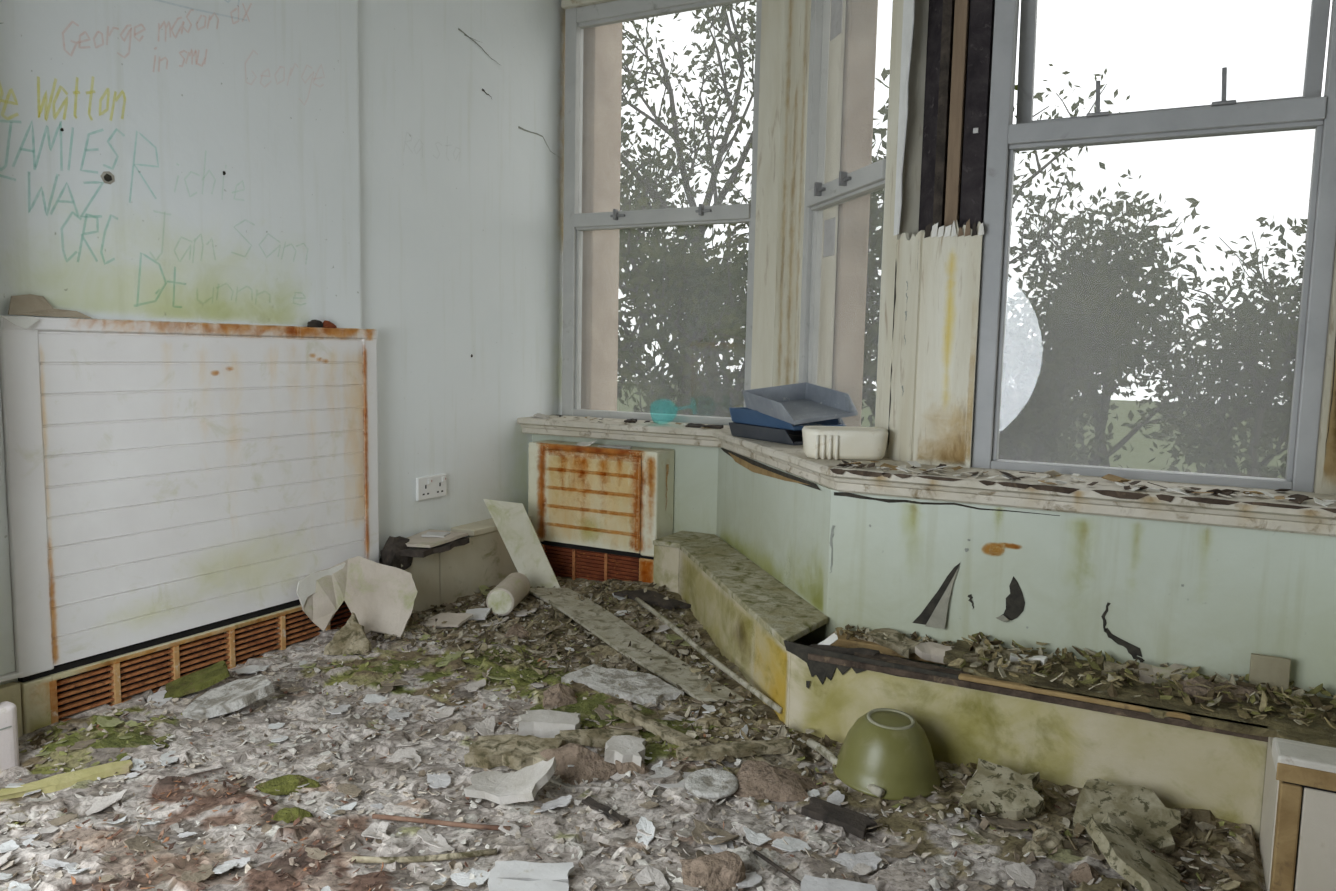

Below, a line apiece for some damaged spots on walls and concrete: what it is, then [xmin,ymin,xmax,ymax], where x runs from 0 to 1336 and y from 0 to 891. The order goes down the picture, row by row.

peeling [924,219,984,238]
rust [270,320,353,335]
rust [539,443,669,550]
peeling [830,460,1336,513]
peeling [912,539,970,629]
peeling [996,576,1028,629]
crack [1101,602,1145,663]